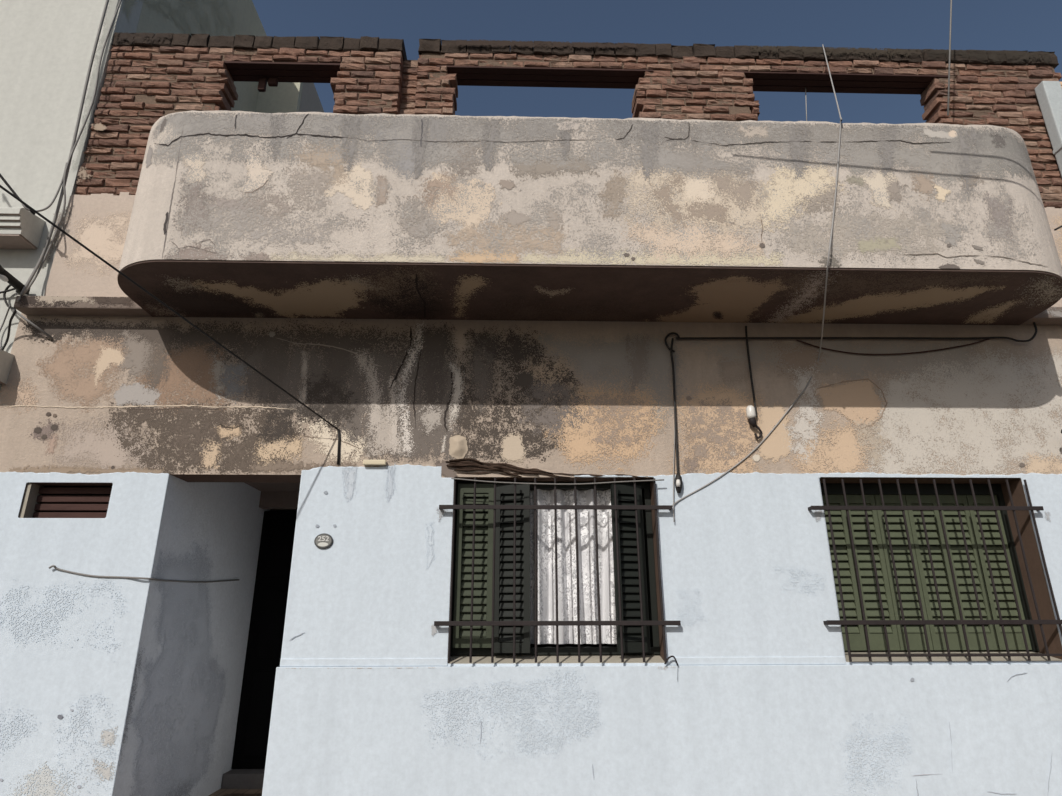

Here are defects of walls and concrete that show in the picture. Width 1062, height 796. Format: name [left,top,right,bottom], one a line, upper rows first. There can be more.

crack [9,405,285,429]
peeling [156,274,373,319]
peeling [162,140,390,260]
crack [277,274,426,427]
crack [154,114,633,257]
spalling [433,460,458,478]
crack [444,370,469,458]
peeling [414,171,564,232]
damp [0,112,1043,503]
peeling [517,339,1062,476]
peeling [595,161,1062,325]
peeling [922,129,958,139]